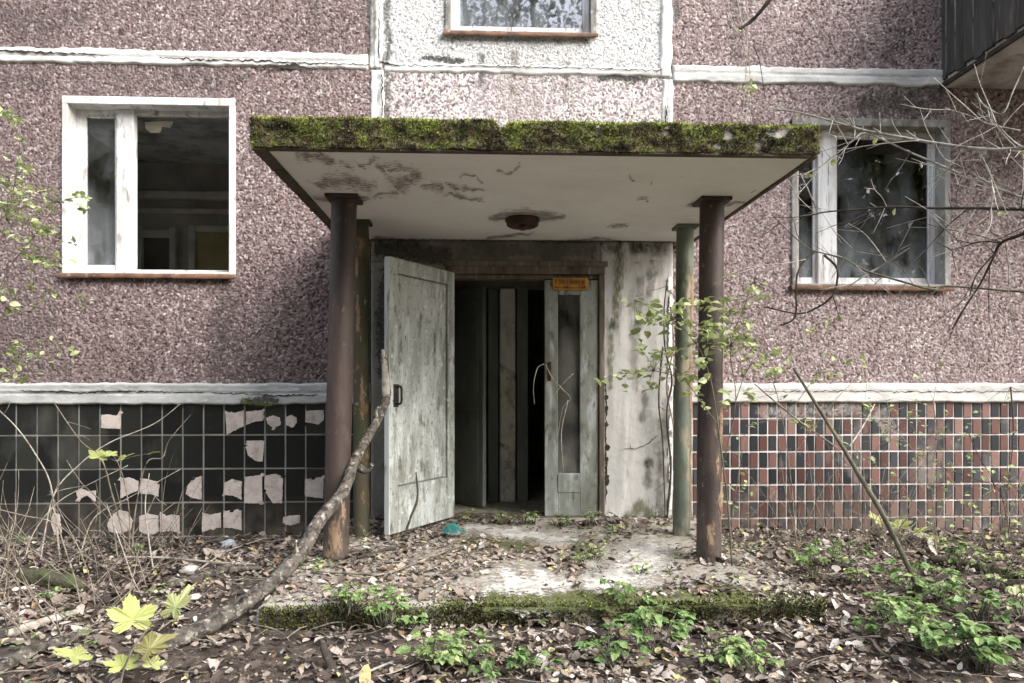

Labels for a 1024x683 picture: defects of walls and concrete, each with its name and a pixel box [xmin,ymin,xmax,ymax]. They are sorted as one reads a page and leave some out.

spalling [101,411,123,429]
spalling [225,395,324,435]
spalling [51,513,62,537]
spalling [76,489,96,502]
spalling [107,477,181,536]
spalling [186,476,202,500]
spalling [202,440,285,532]
spalling [280,515,300,526]
spalling [305,475,325,498]
rust [323,501,346,559]
water stain [646,411,670,516]
rust [706,407,723,553]